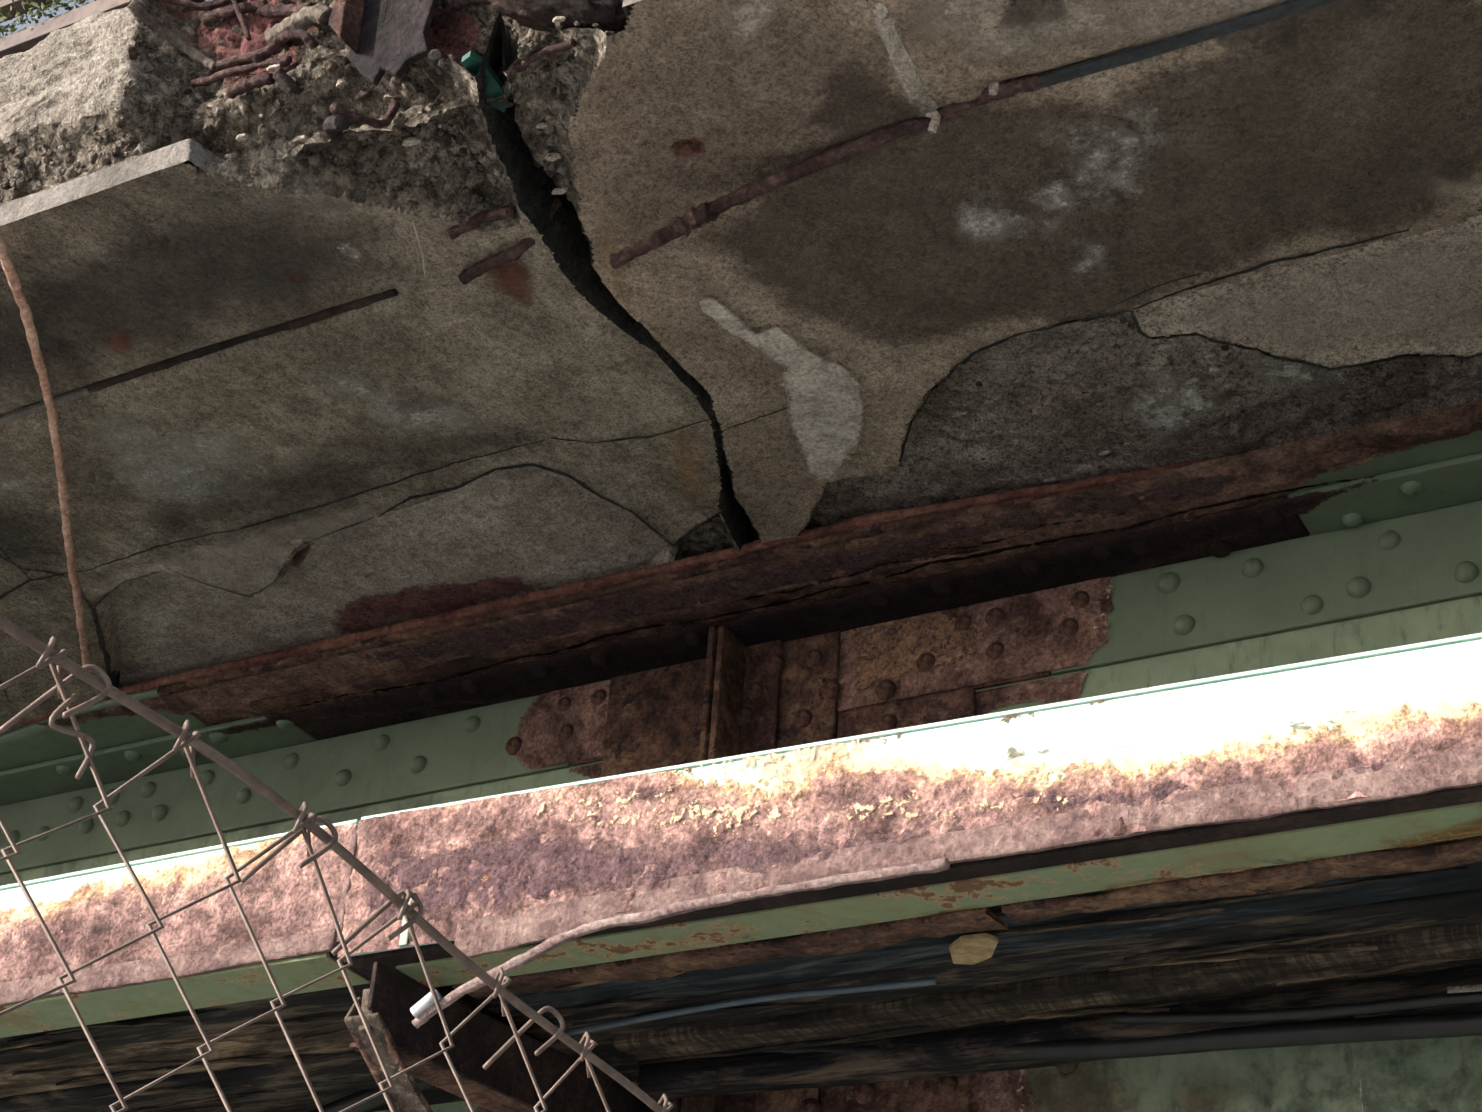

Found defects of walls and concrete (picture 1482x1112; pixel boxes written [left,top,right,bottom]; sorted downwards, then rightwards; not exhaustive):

spalling [0,0,626,285]
leakage [720,0,1482,344]
crack [0,11,790,688]
corrosion [36,400,1482,779]
spalling [796,312,1482,536]
corrosion [452,820,1482,999]